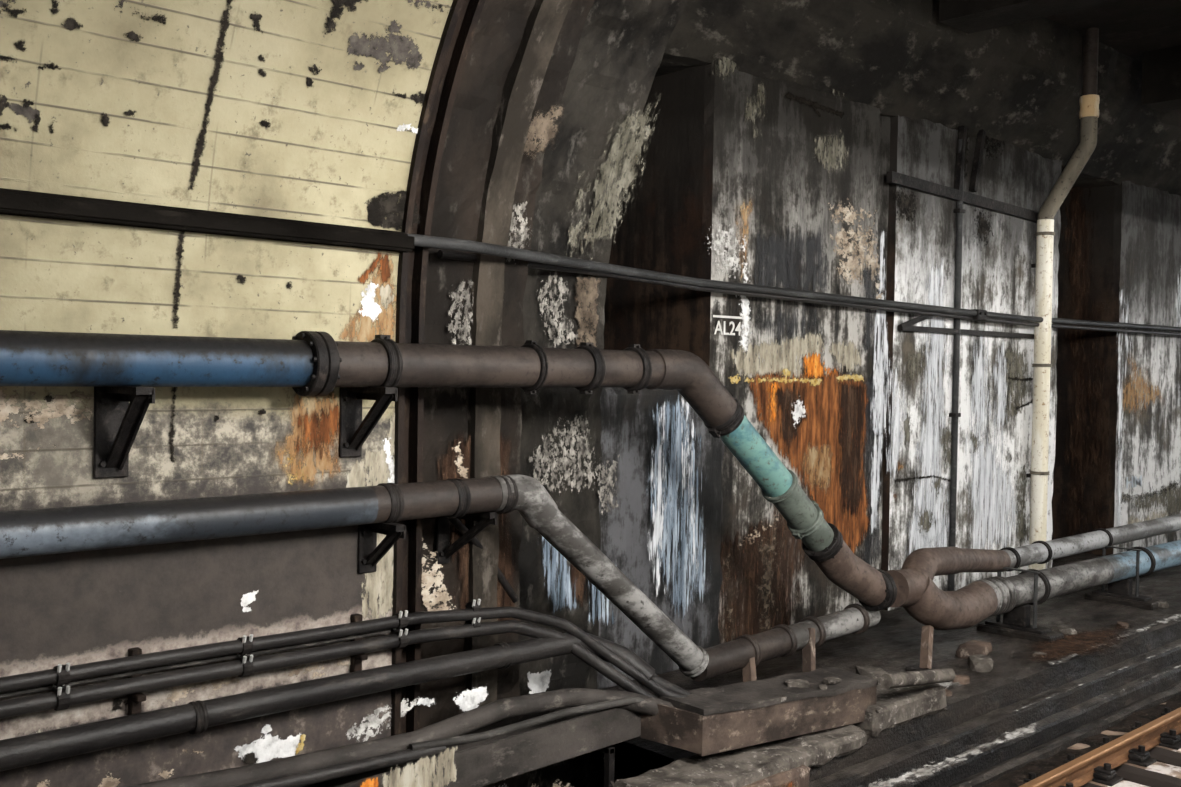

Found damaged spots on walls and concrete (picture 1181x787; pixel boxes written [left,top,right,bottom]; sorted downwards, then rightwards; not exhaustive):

crack [188,0,233,190]
peeling [347,19,422,73]
crack [172,231,186,329]
peeling [367,190,420,231]
water stain [566,99,658,259]
crack [168,387,177,462]
corrosion [272,391,340,485]
water stain [647,396,706,618]
corrosion [749,351,870,554]
water stain [860,231,951,565]
water stain [966,326,1018,549]
peeling [234,724,306,765]